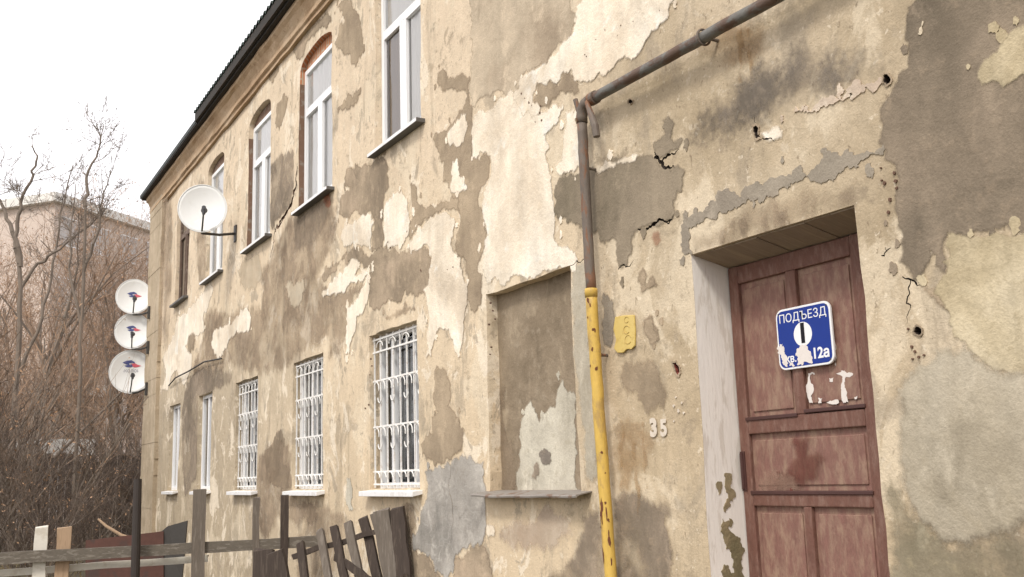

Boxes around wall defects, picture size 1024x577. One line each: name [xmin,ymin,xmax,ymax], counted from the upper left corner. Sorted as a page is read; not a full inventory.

crack [654,149,679,170]
crack [270,166,298,257]
crack [638,217,674,231]
flaking render [322,0,1024,491]
peeling [238,254,261,289]
peeling [286,279,305,308]
crack [902,276,920,322]
flaking render [411,547,440,577]
flaking render [453,524,495,577]
peeling [716,473,745,577]
damp [888,487,1024,577]